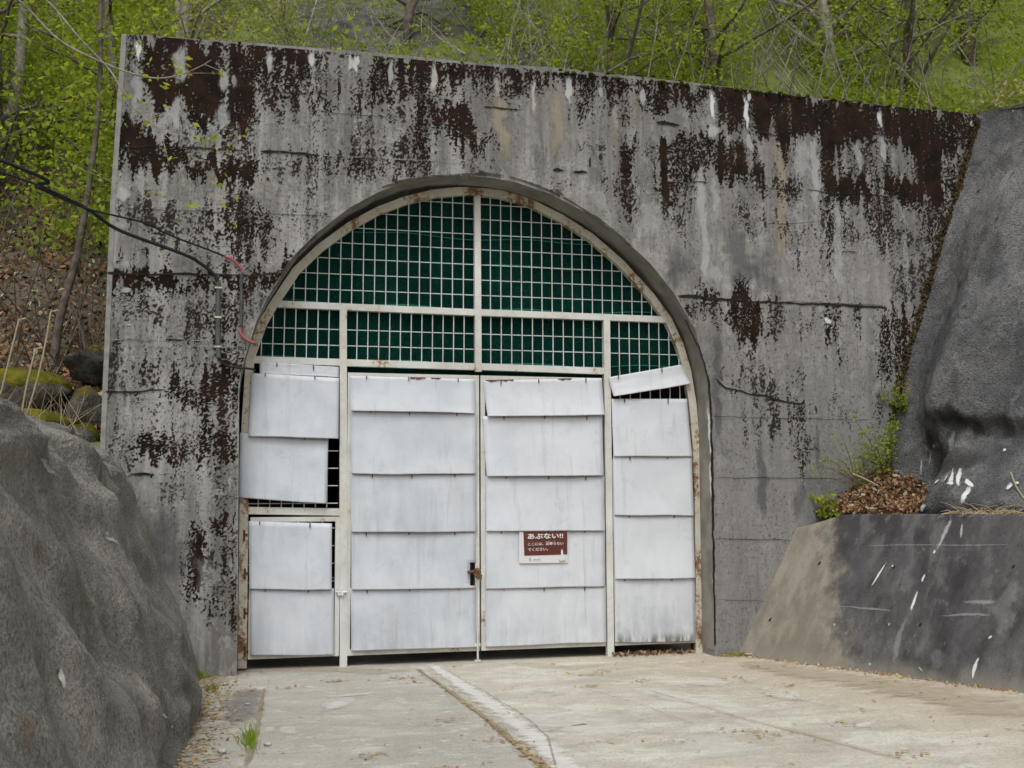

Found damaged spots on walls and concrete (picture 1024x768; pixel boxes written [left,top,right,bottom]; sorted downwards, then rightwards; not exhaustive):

water stain [221,116,266,165]
efflorescence [348,56,360,72]
water stain [698,92,718,138]
water stain [743,94,751,128]
water stain [217,179,254,223]
water stain [601,156,697,250]
water stain [773,141,790,254]
water stain [159,391,238,511]
crack [679,294,887,646]
water stain [787,355,817,484]
water stain [939,403,985,434]
water stain [216,531,237,641]